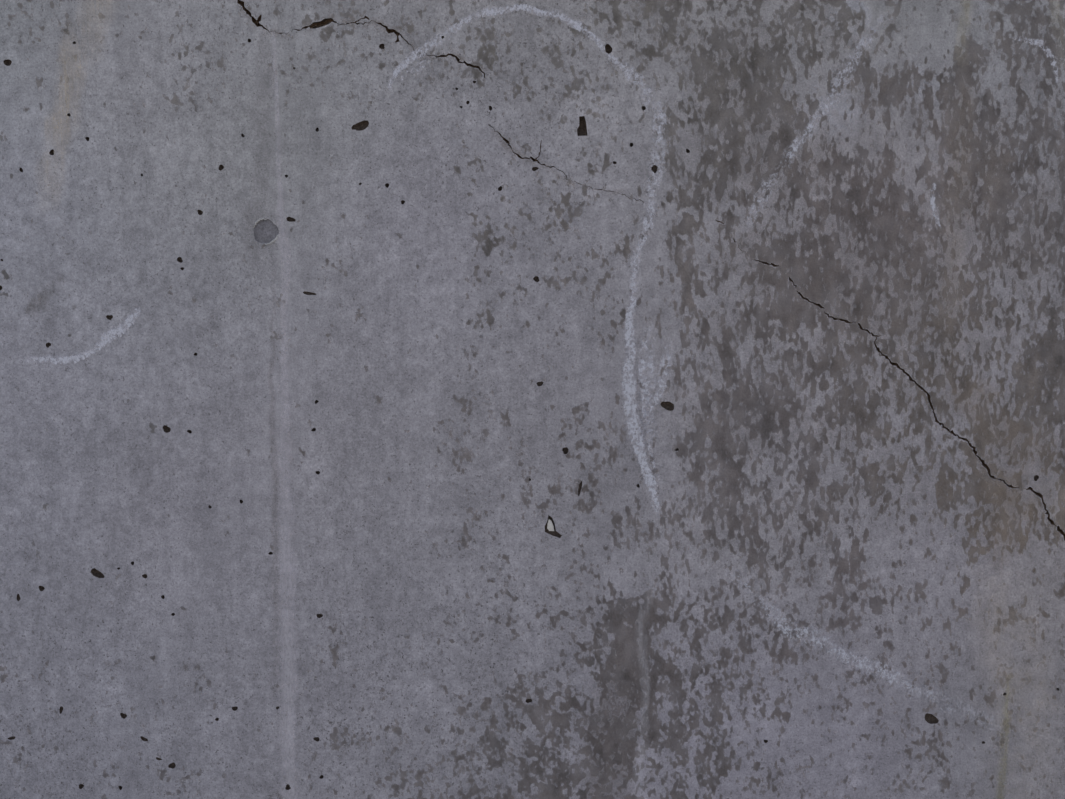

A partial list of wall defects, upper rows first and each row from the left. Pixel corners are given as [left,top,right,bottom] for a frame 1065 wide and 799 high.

crack [237,0,485,78]
crack [488,124,648,204]
crack [716,220,1065,541]